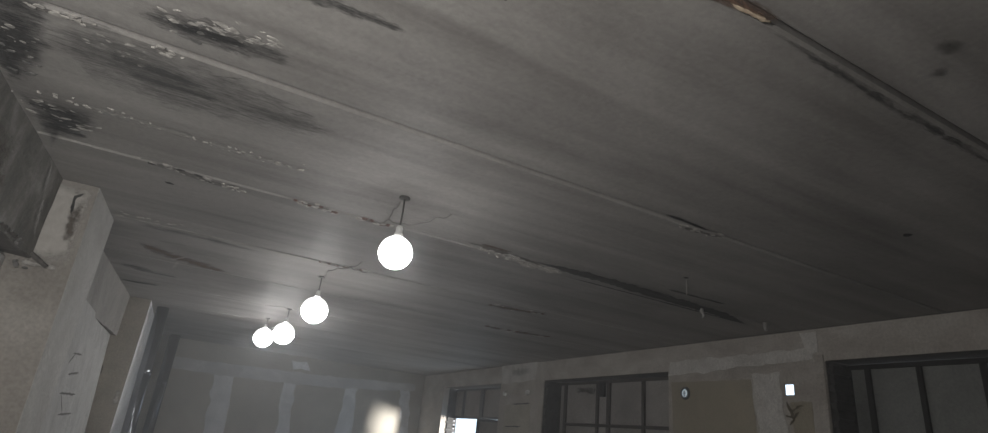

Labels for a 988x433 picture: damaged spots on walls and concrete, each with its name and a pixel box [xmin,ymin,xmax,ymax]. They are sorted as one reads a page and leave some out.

water stain [312,0,399,30]
water stain [0,0,308,128]
water stain [11,90,102,139]